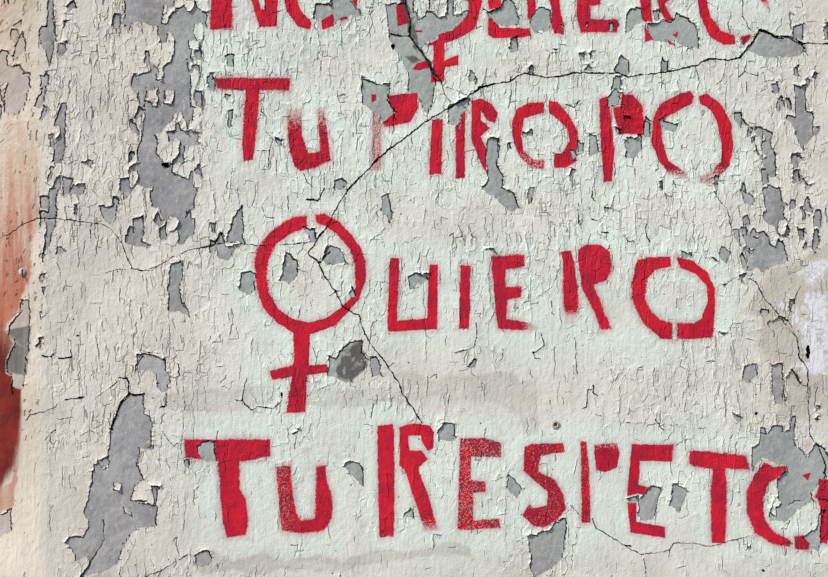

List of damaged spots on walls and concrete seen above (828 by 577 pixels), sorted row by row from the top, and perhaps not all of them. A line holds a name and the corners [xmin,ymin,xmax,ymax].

rust [0,0,22,49]
rust [0,94,49,304]
peeling [98,0,237,250]
peeling [208,202,247,263]
crack [0,0,828,423]
peeling [383,0,470,116]
peeling [707,20,823,294]
crack [25,354,180,444]
peeling [62,391,162,577]
leakage [739,233,828,425]
crack [748,278,828,504]
peeling [749,413,828,554]